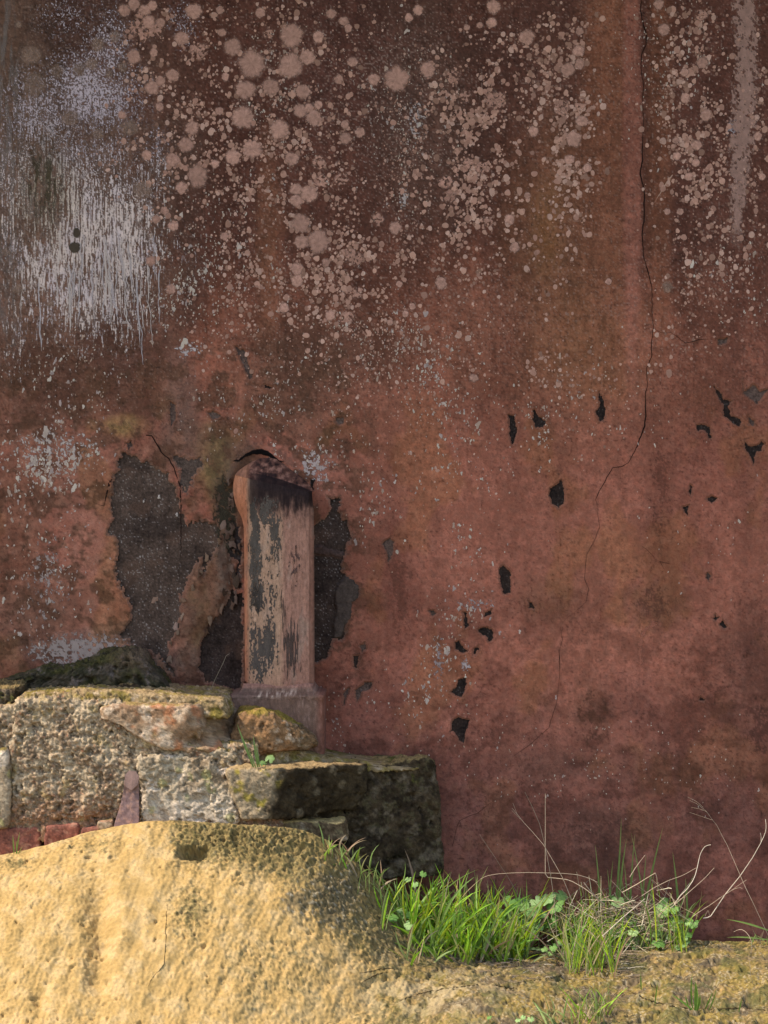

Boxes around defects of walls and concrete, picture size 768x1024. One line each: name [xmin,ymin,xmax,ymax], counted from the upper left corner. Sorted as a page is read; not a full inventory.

leakage [727,0,761,234]
leakage [0,1,196,379]
flaking render [504,406,550,448]
flaking render [591,387,609,425]
crack [515,1,703,755]
flaking render [694,377,768,467]
flaking render [546,476,568,513]
flaking render [103,438,376,705]
flaking render [451,563,515,660]
flaking render [446,675,470,700]